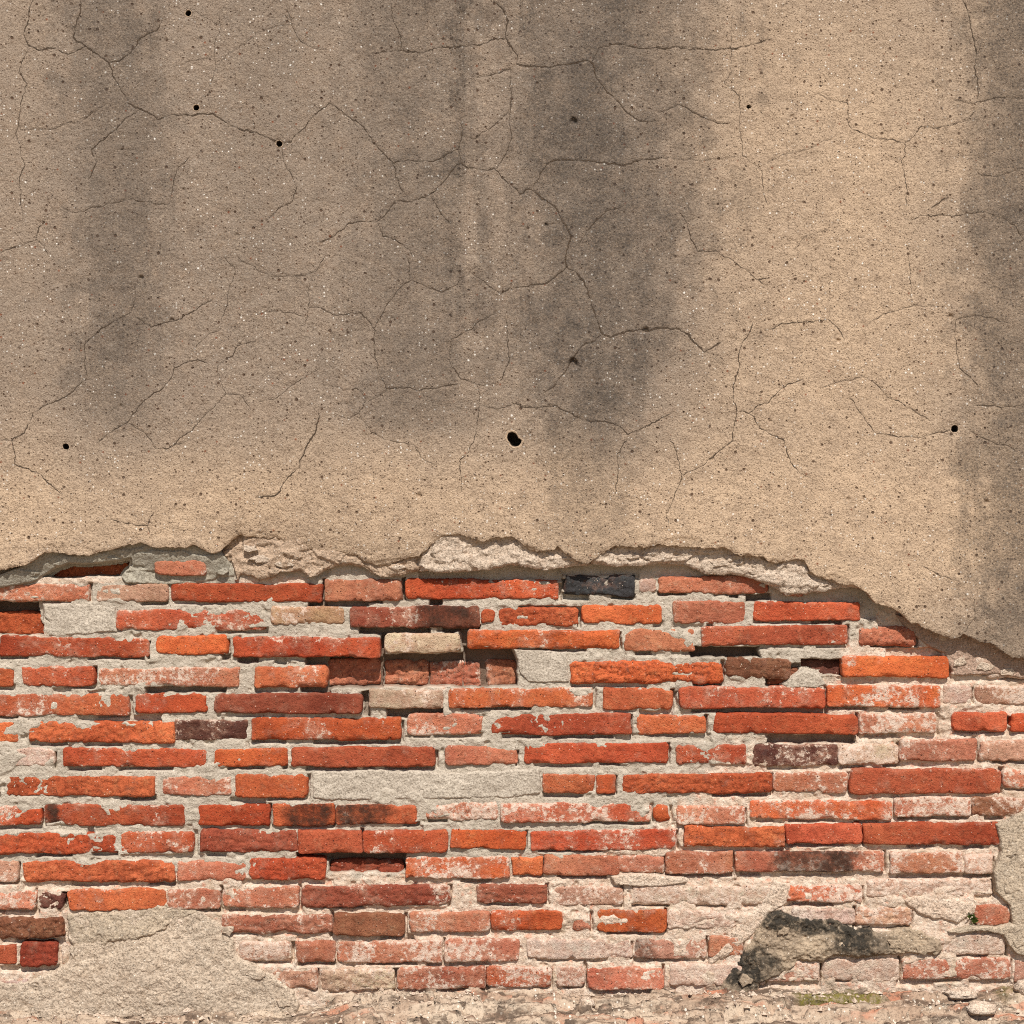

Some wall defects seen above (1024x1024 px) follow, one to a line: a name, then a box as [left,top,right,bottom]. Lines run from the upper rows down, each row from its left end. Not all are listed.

crack [0,1,1024,521]
flaking render [0,534,861,596]
flaking render [895,614,1024,679]
peeling [0,902,300,1022]
leakage [726,947,779,989]
leakage [763,910,879,954]
peeling [718,811,1024,995]